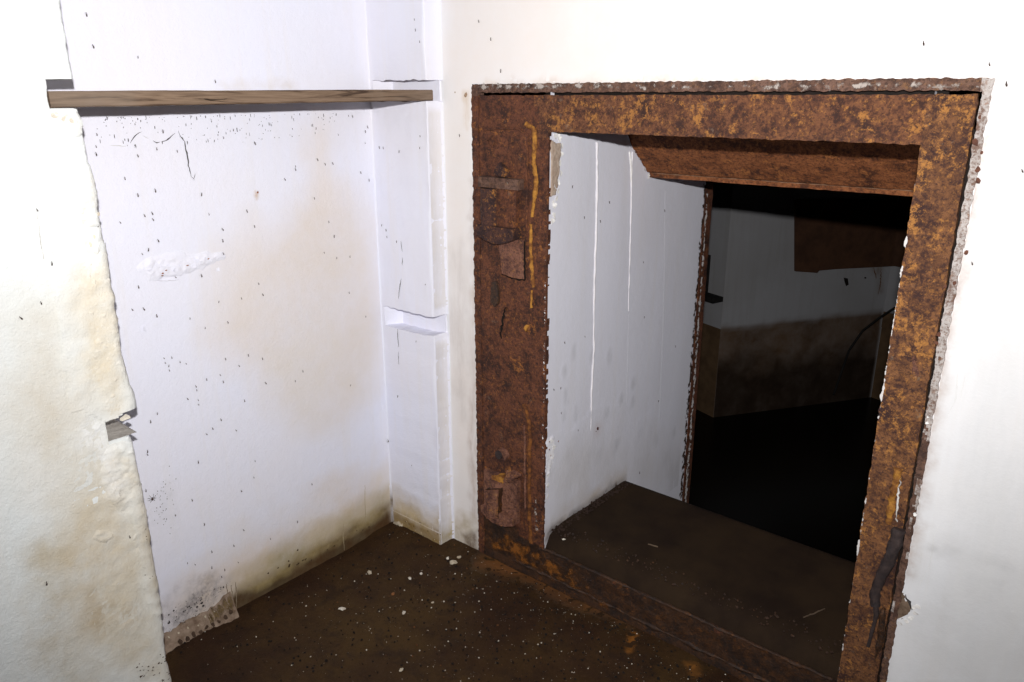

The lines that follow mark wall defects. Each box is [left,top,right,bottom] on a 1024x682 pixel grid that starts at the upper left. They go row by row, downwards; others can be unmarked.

crack [111,131,195,179]
leakage [442,0,716,238]
peeling [100,414,151,554]
leakage [0,102,479,682]
corrosion [469,535,642,656]
corrosion [454,60,1006,582]